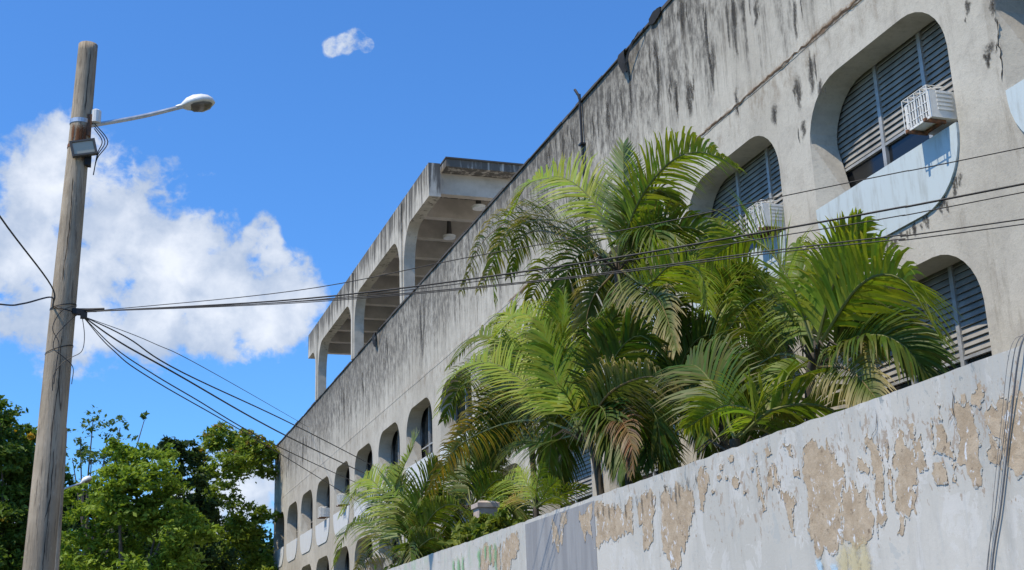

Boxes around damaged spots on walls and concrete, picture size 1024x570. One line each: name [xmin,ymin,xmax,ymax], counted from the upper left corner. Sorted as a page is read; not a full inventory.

water stain [703,9,715,85]
water stain [725,0,759,54]
corrosion [807,0,856,45]
water stain [590,76,632,136]
water stain [649,45,694,115]
water stain [793,58,826,104]
peeling [551,383,1024,570]
peeling [480,530,519,570]